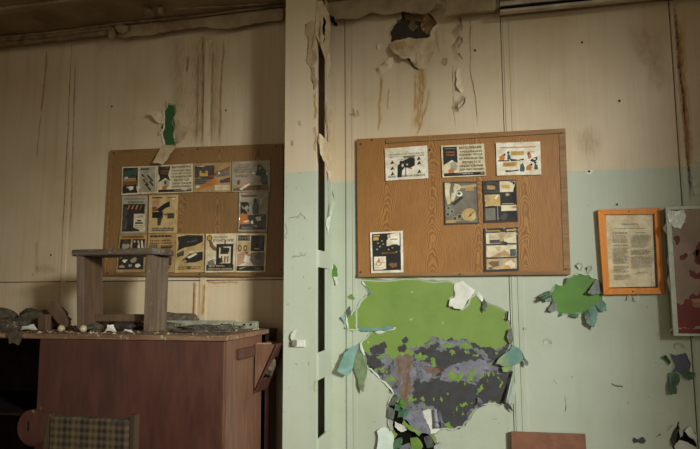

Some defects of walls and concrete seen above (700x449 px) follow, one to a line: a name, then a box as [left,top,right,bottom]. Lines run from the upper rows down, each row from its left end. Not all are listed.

peeling [304,0,331,90]
peeling [387,11,439,70]
peeling [440,16,465,112]
peeling [148,101,188,165]
peeling [318,103,336,233]
peeling [538,272,607,328]
peeling [663,209,700,308]
peeling [337,277,528,449]
peeling [663,352,695,395]
peeling [670,422,697,449]